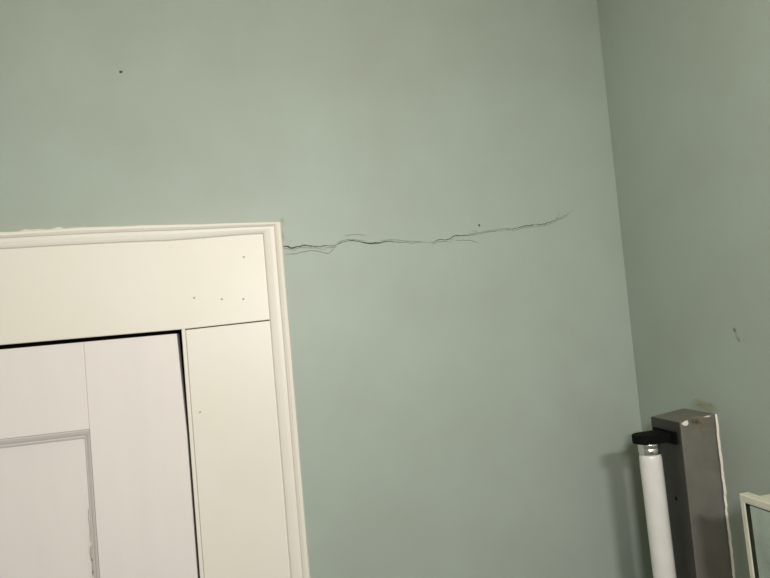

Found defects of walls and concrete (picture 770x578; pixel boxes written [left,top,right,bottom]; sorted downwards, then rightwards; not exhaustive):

crack [283,212,570,255]